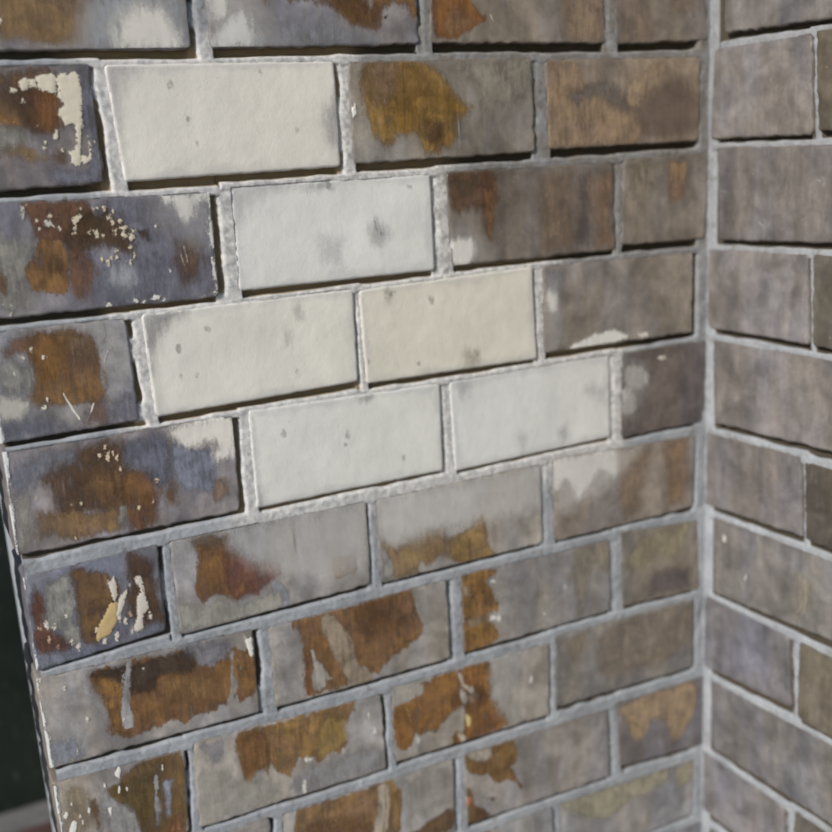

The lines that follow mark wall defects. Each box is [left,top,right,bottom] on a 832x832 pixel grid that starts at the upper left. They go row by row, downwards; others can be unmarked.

peeling [9,71,95,166]
peeling [88,206,136,267]
peeling [30,620,82,670]
peeling [95,576,152,644]
peeling [291,589,424,696]
peeling [86,647,256,739]
peeling [392,656,521,751]
peeling [198,700,385,823]
peeling [465,740,523,789]
peeling [294,769,454,832]
peeling [466,789,489,824]